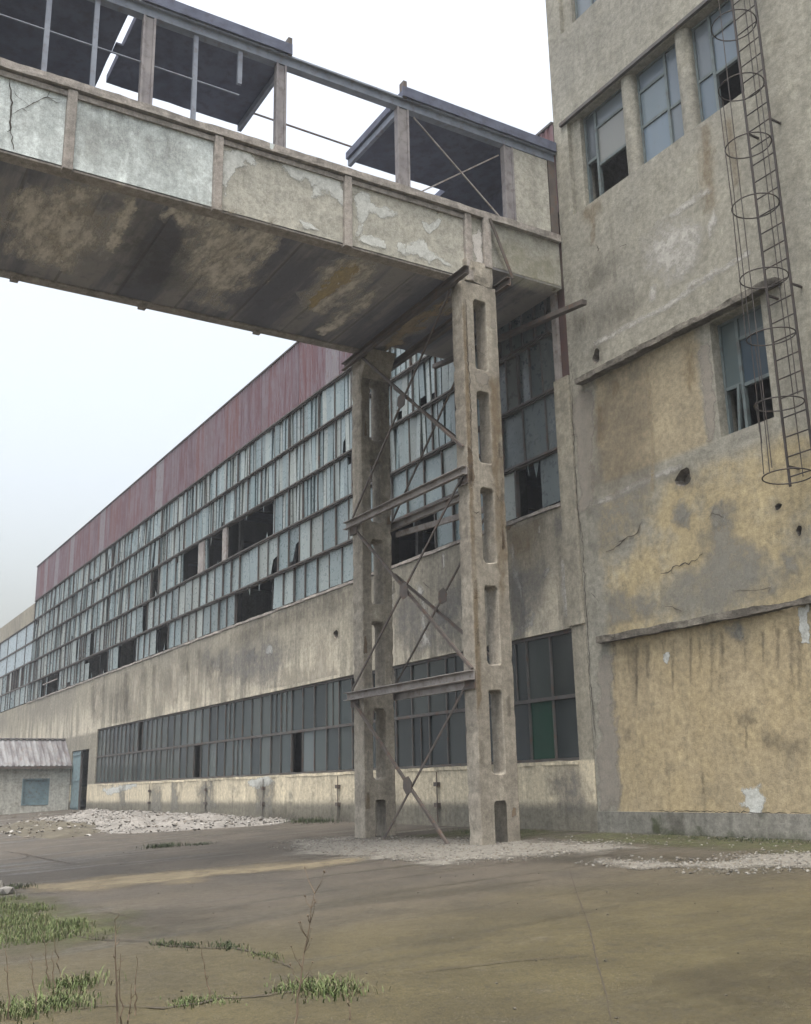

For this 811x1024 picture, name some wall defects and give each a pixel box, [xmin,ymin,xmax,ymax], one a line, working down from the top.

crack [7,82,58,149]
peeling [223,149,255,195]
damp [1,185,138,271]
damp [160,206,278,310]
peeling [281,163,450,266]
damp [303,259,375,336]
hole [675,467,691,486]
crack [571,371,642,745]
peeling [798,604,810,643]
peeling [740,785,765,813]